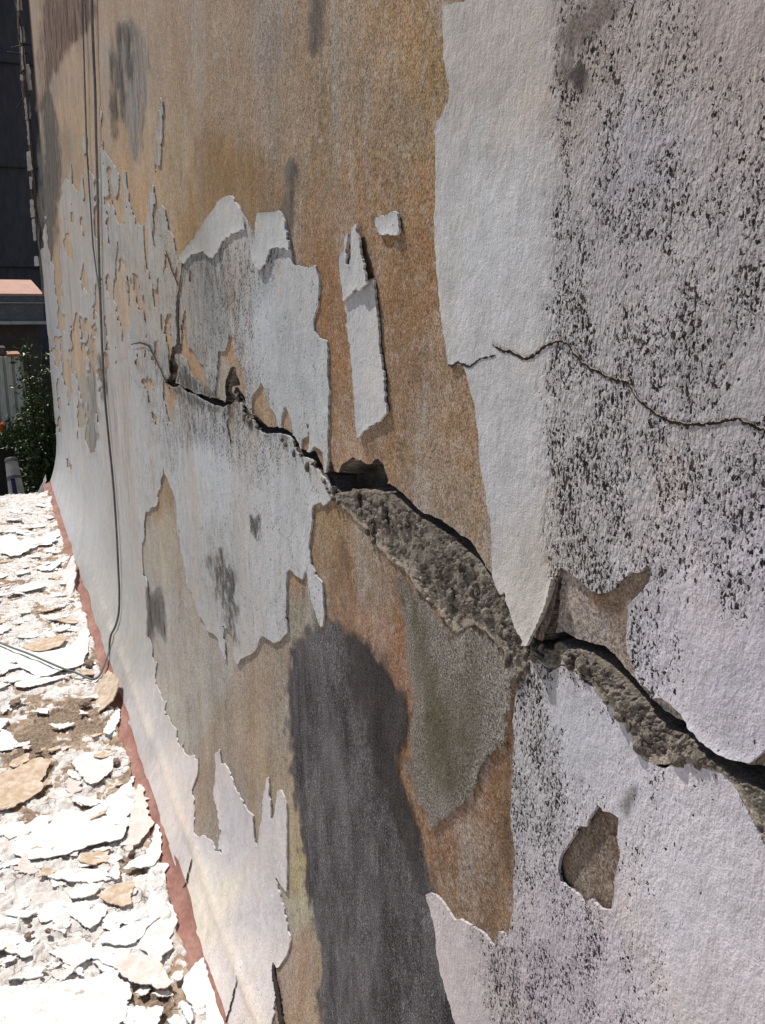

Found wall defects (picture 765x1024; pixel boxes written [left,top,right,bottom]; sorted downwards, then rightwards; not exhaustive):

corrosion [35,0,96,111]
damp [109,22,148,158]
damp [561,0,619,90]
peeling [7,0,524,1024]
crack [131,250,765,843]
peeling [521,567,683,720]
damp [283,577,511,1024]
peeling [561,807,620,909]
peeling [746,753,765,766]